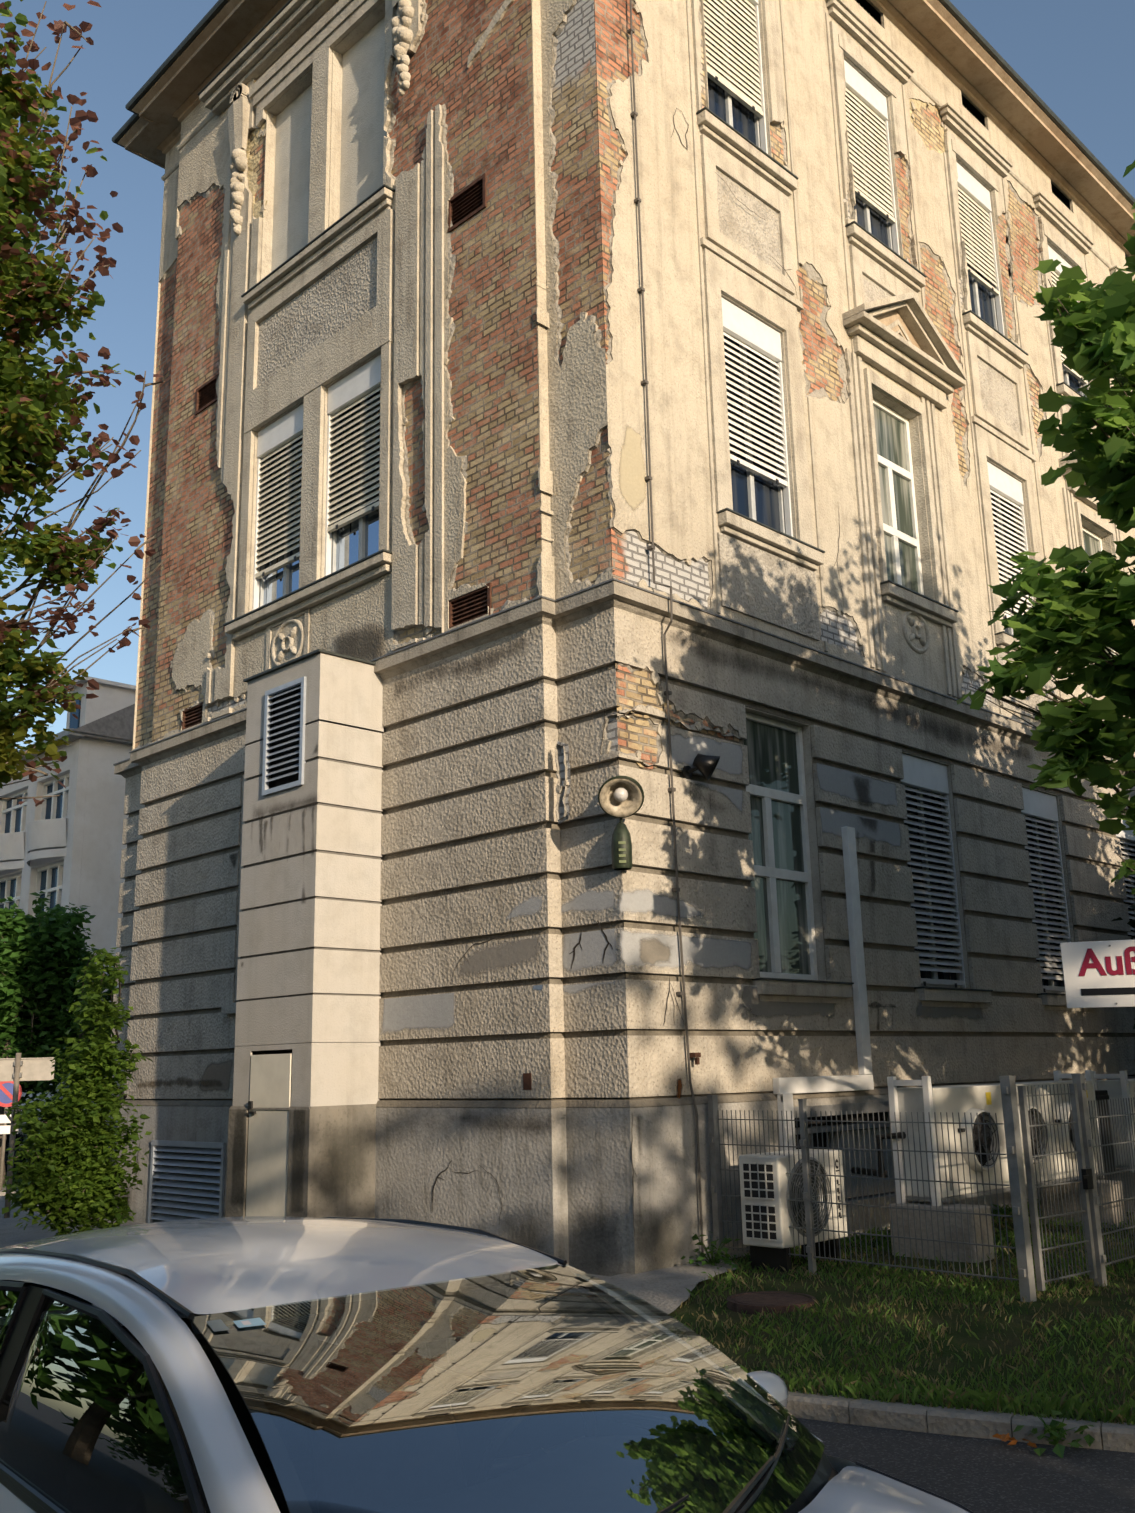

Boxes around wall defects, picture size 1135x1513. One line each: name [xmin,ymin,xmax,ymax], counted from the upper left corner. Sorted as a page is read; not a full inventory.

flaking render [909,98,946,154]
flaking render [387,0,649,615]
flaking render [796,262,849,404]
flaking render [894,153,965,367]
flaking render [996,181,1044,342]
flaking render [135,183,247,748]
flaking render [564,427,713,609]
flaking render [951,386,970,486]
flaking render [819,606,864,657]
flaking render [601,662,740,770]
leakage [292,1111,305,1211]
crack [432,1160,502,1219]